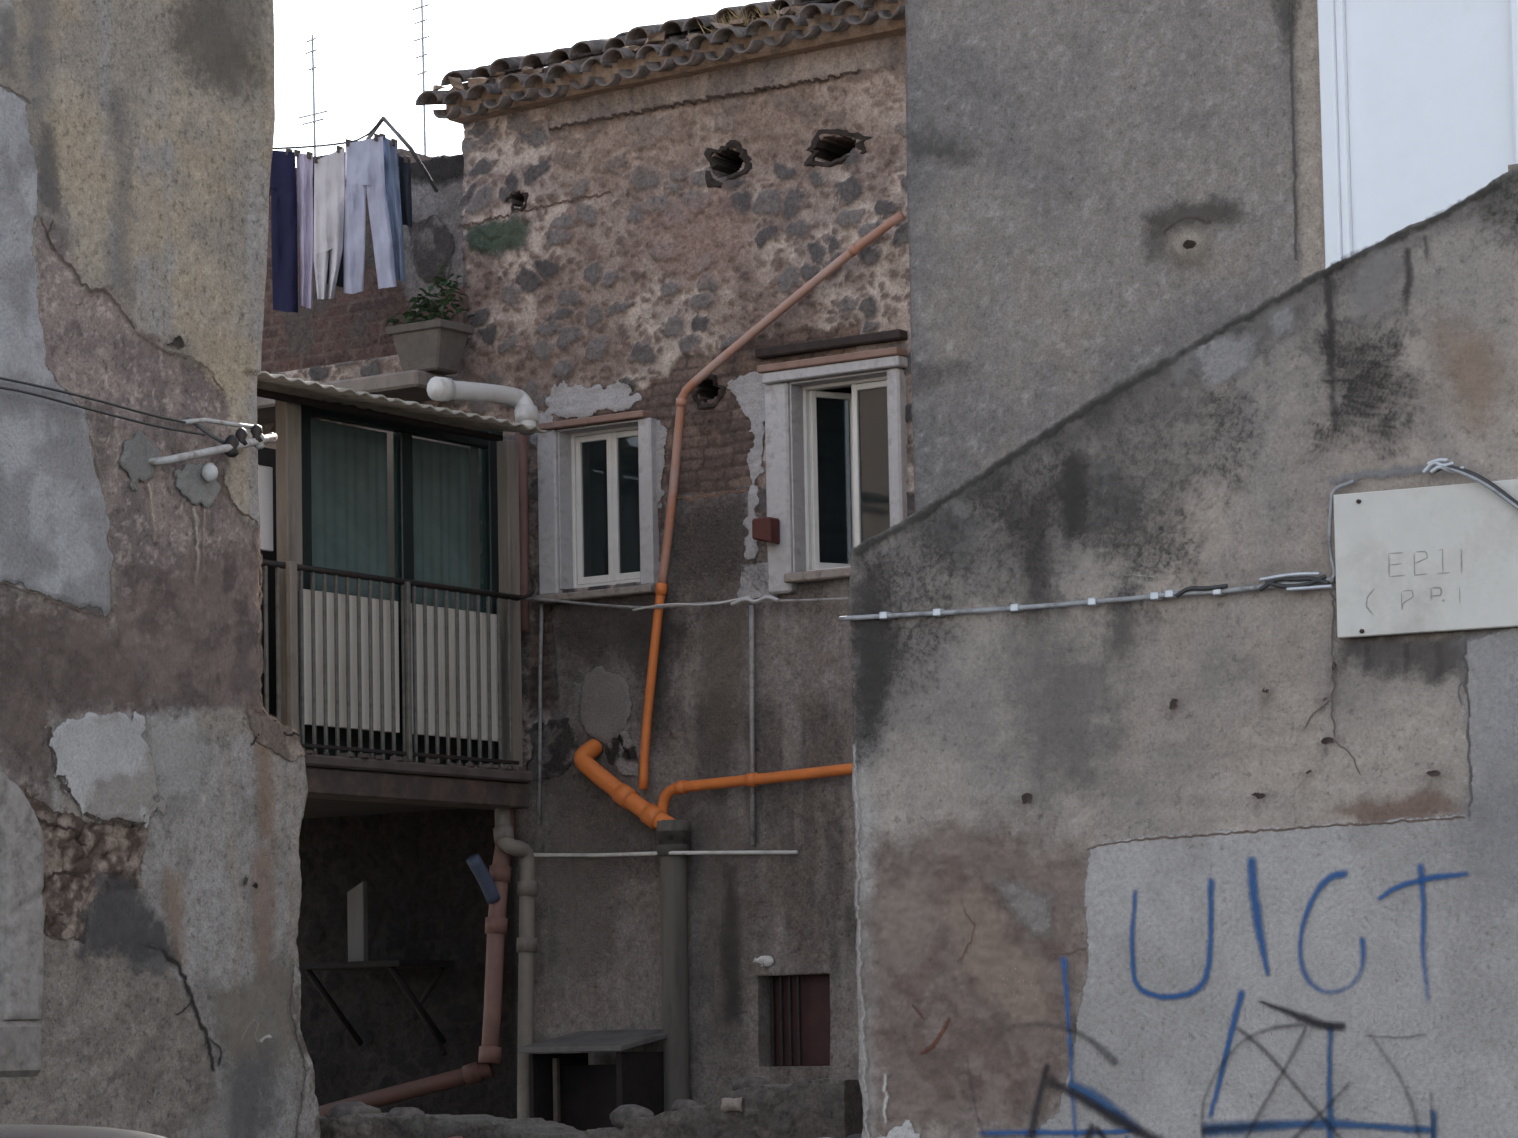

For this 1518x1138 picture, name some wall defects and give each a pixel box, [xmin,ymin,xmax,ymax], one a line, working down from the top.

flaking render [0,84,114,617]
flaking render [24,710,209,944]
spalling [247,531,305,762]
flaking render [530,379,642,468]
flaking render [692,371,778,599]
damp [849,378,1253,762]
crack [1087,641,1473,850]
crack [1305,594,1360,774]
damp [1314,261,1413,438]
damp [1403,236,1427,305]
damp [1339,627,1518,682]
crack [145,945,222,1072]